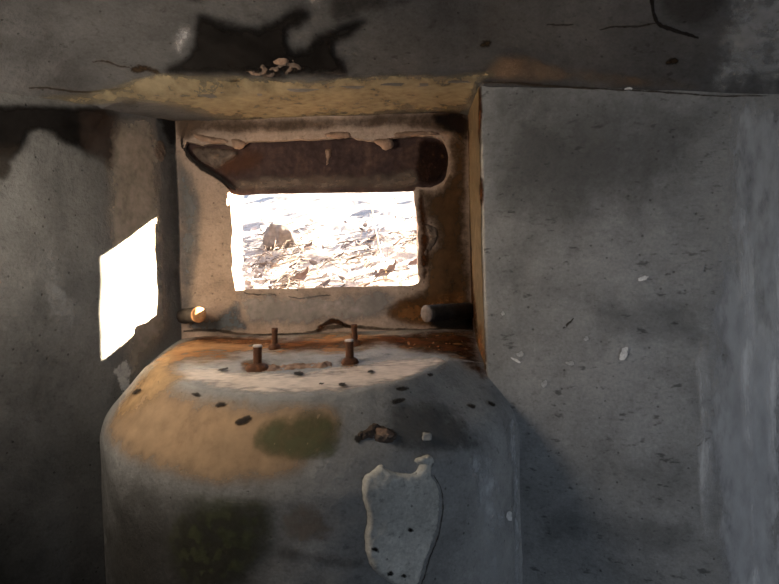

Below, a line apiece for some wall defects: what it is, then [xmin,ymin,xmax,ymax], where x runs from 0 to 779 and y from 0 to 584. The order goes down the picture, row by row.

crack [599,0,699,39]
spalling [248,58,302,77]
spalling [186,131,448,196]
corrosion [156,122,485,372]